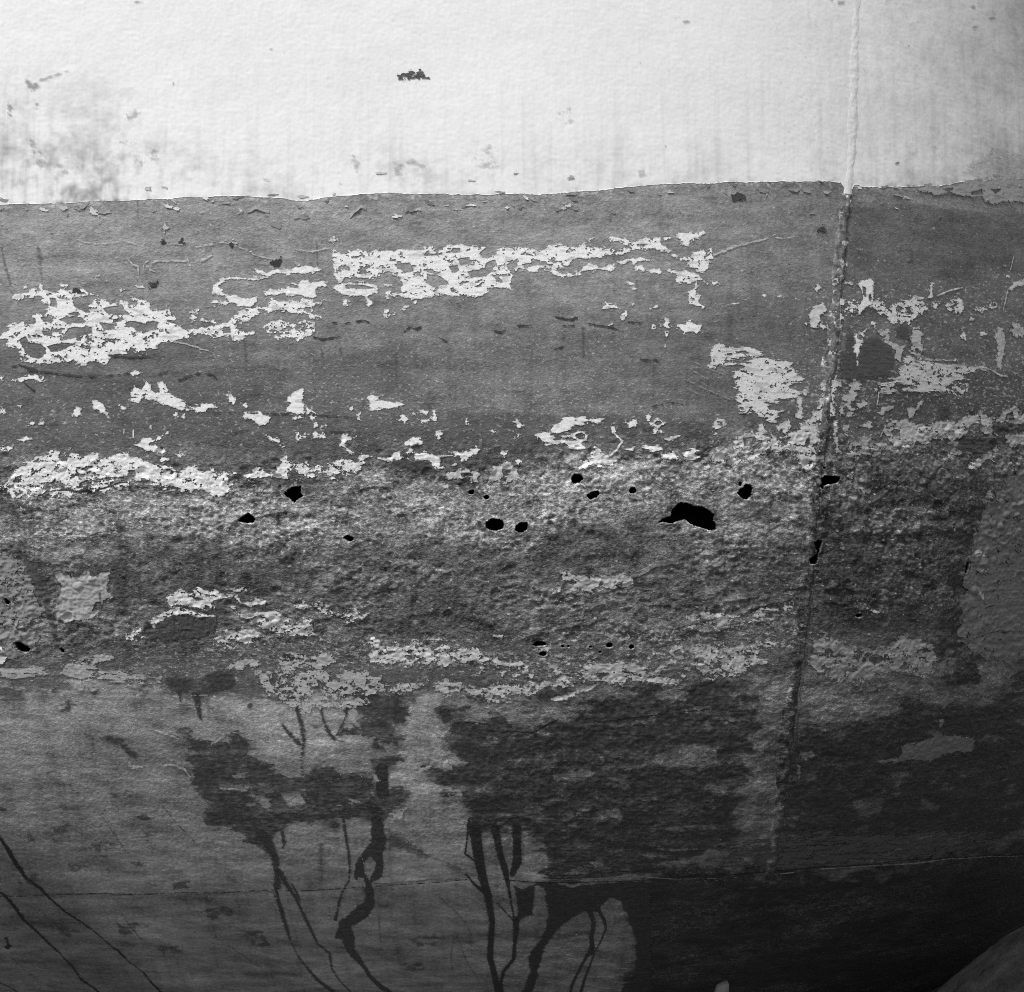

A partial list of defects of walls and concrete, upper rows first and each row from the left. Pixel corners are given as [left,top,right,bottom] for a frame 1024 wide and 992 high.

peeling [22,201,111,217]
peeling [0,230,719,383]
peeling [534,256,1024,500]
peeling [0,370,526,503]
spalling [658,502,716,530]
water stain [535,687,600,706]
crack [503,854,1018,883]